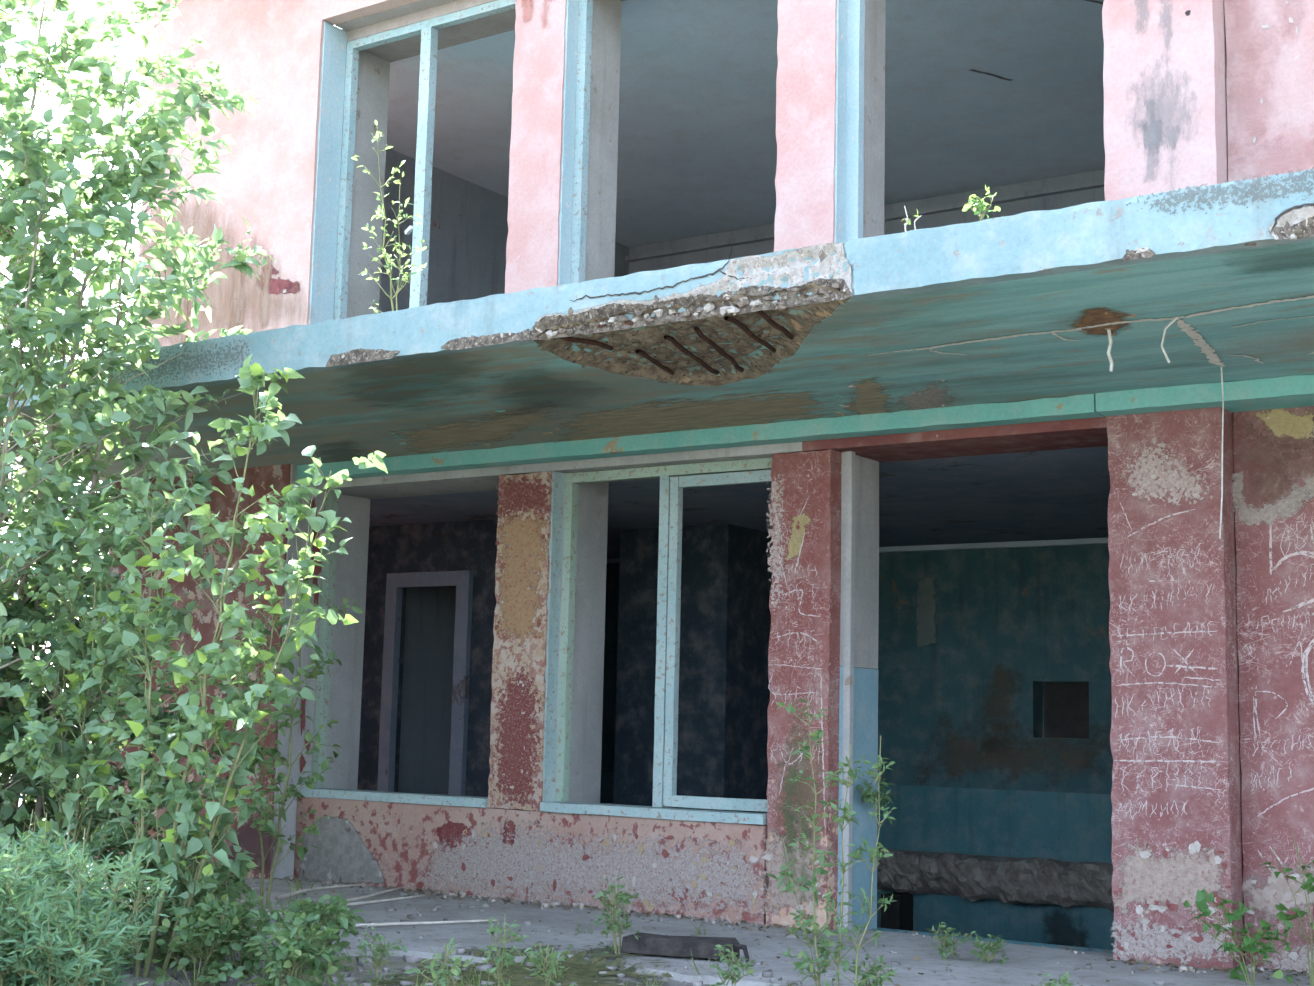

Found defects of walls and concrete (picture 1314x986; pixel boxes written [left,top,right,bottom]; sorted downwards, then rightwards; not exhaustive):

spalling [1268,206,1314,240]
peeling [258,264,300,295]
crack [570,248,745,302]
spalling [441,243,955,443]
crack [868,295,1314,367]
corrosion [1073,308,1136,336]
peeling [1256,408,1314,439]
peeling [495,476,551,646]
peeling [416,663,826,919]
peeling [1111,838,1314,973]